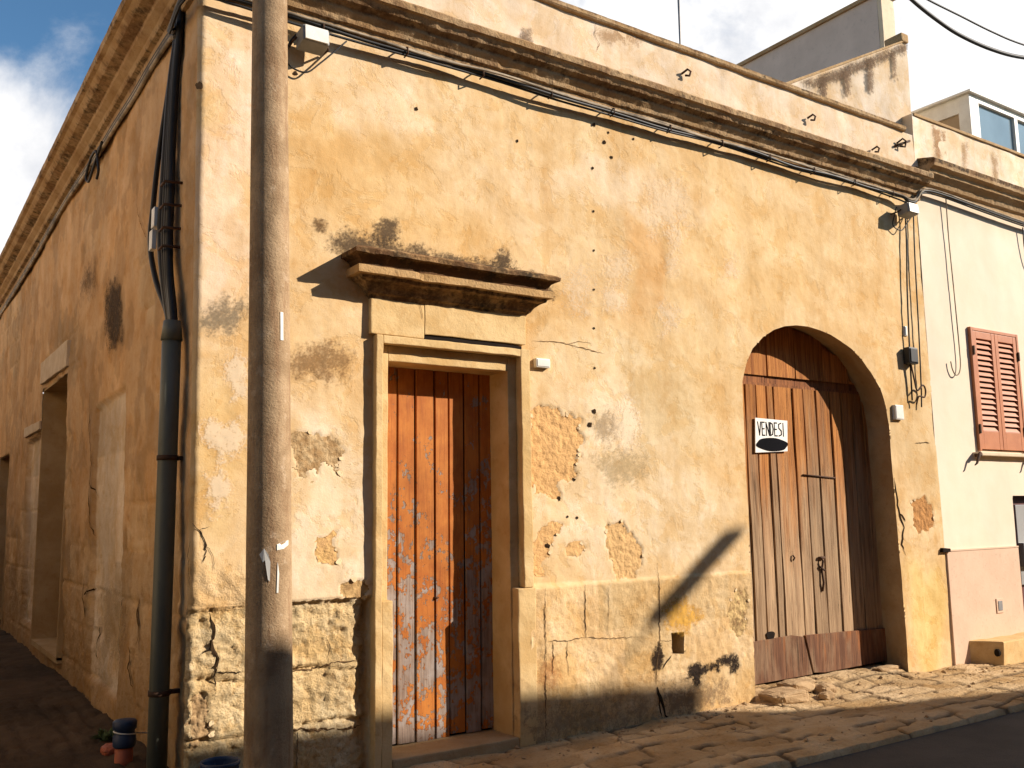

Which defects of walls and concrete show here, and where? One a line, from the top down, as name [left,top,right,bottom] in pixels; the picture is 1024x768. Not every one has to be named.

damp [314,218,515,269]
damp [104,272,123,351]
damp [202,301,249,334]
damp [290,341,349,380]
peeling [291,430,345,483]
peeling [530,406,596,501]
spalling [910,495,935,534]
crack [187,523,214,562]
peeling [315,530,342,565]
peeling [533,515,587,577]
peeling [605,519,645,582]
crack [202,614,241,690]